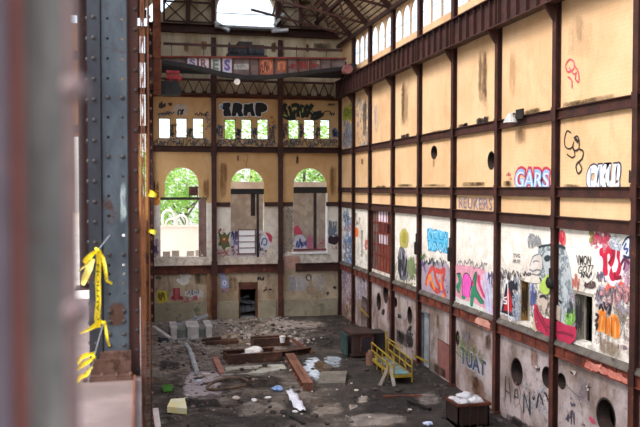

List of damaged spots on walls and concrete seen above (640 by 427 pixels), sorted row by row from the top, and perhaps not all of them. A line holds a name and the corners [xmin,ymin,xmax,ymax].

peeling [475,311,490,331]
peeling [584,360,627,384]